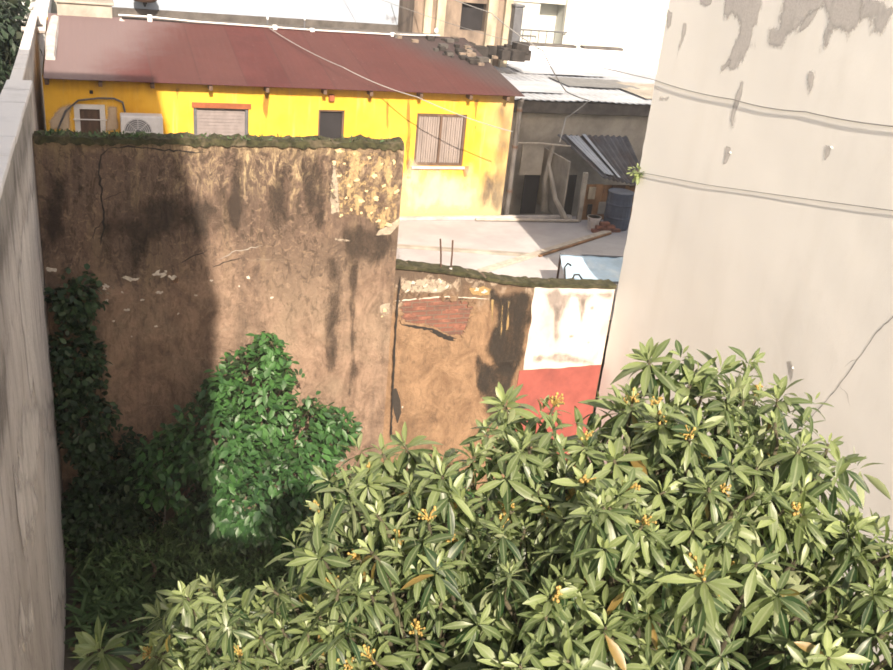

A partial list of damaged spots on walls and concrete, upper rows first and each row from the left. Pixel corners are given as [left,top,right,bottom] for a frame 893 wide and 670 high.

crack [92,145,205,245]
leakage [101,197,211,269]
leakage [229,162,241,229]
leakage [302,162,324,229]
peeling [330,148,476,235]
leakage [326,296,339,368]
leakage [344,227,391,345]
spalling [380,279,491,341]
leakage [476,290,531,420]
crack [799,317,893,431]